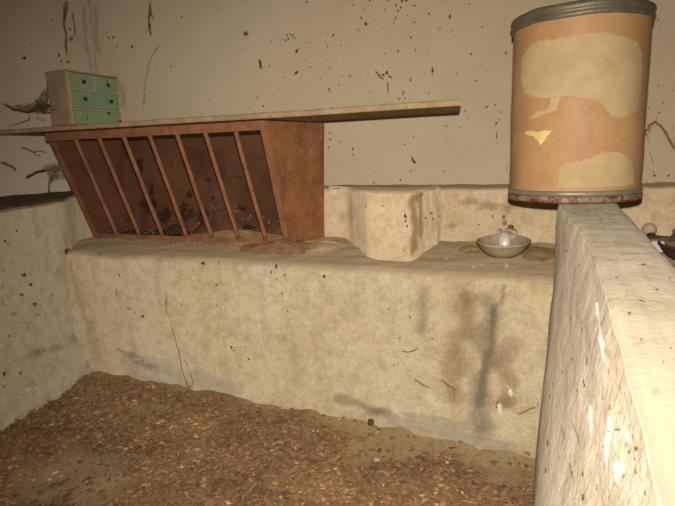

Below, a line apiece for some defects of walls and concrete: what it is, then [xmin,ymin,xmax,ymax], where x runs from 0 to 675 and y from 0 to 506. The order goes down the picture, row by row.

corrosion [410,193,422,253]